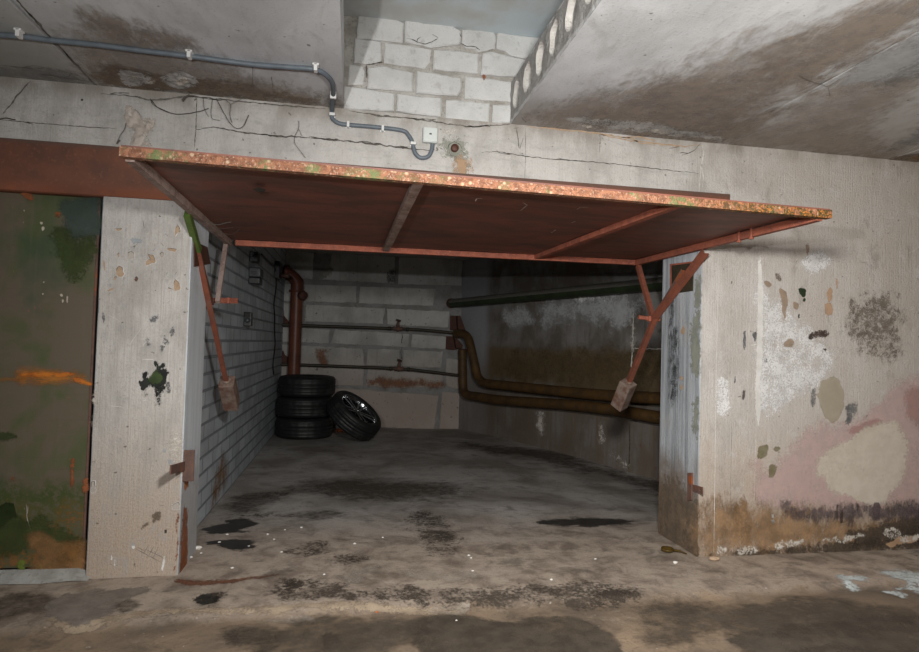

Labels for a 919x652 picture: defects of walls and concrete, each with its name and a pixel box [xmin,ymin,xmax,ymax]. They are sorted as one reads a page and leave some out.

water stain [79,16,315,105]
crack [0,0,919,191]
water stain [537,0,919,162]
flaking render [103,247,177,291]
rust [5,370,91,386]
water stain [782,500,919,547]